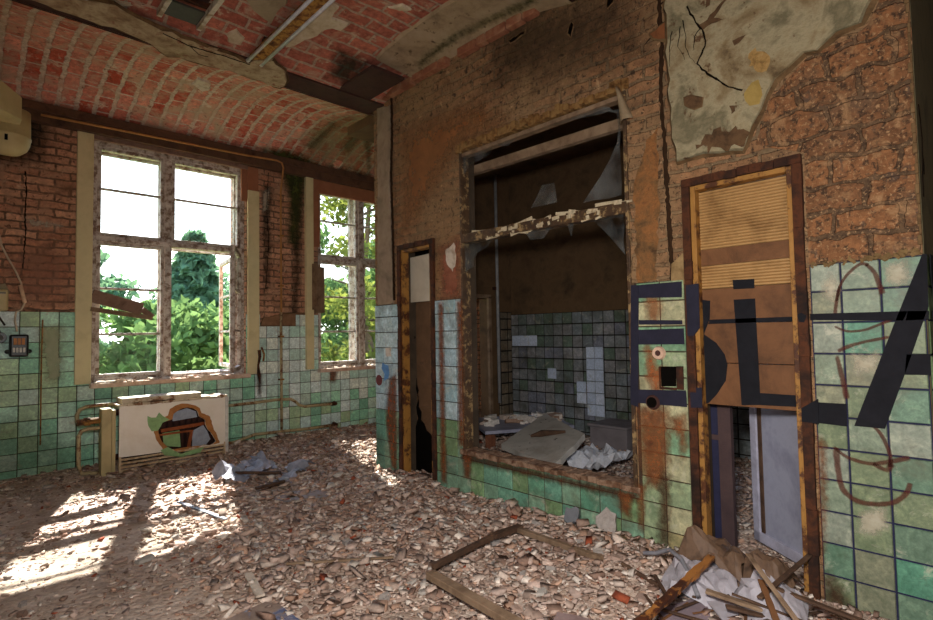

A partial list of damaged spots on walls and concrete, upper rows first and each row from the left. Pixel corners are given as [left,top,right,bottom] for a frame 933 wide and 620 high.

spalling [93,0,253,63]
spalling [633,128,661,283]
spalling [671,254,684,285]
crack [645,0,743,280]
spalling [663,0,923,269]
corrosion [439,304,447,482]
corrosion [457,298,687,544]